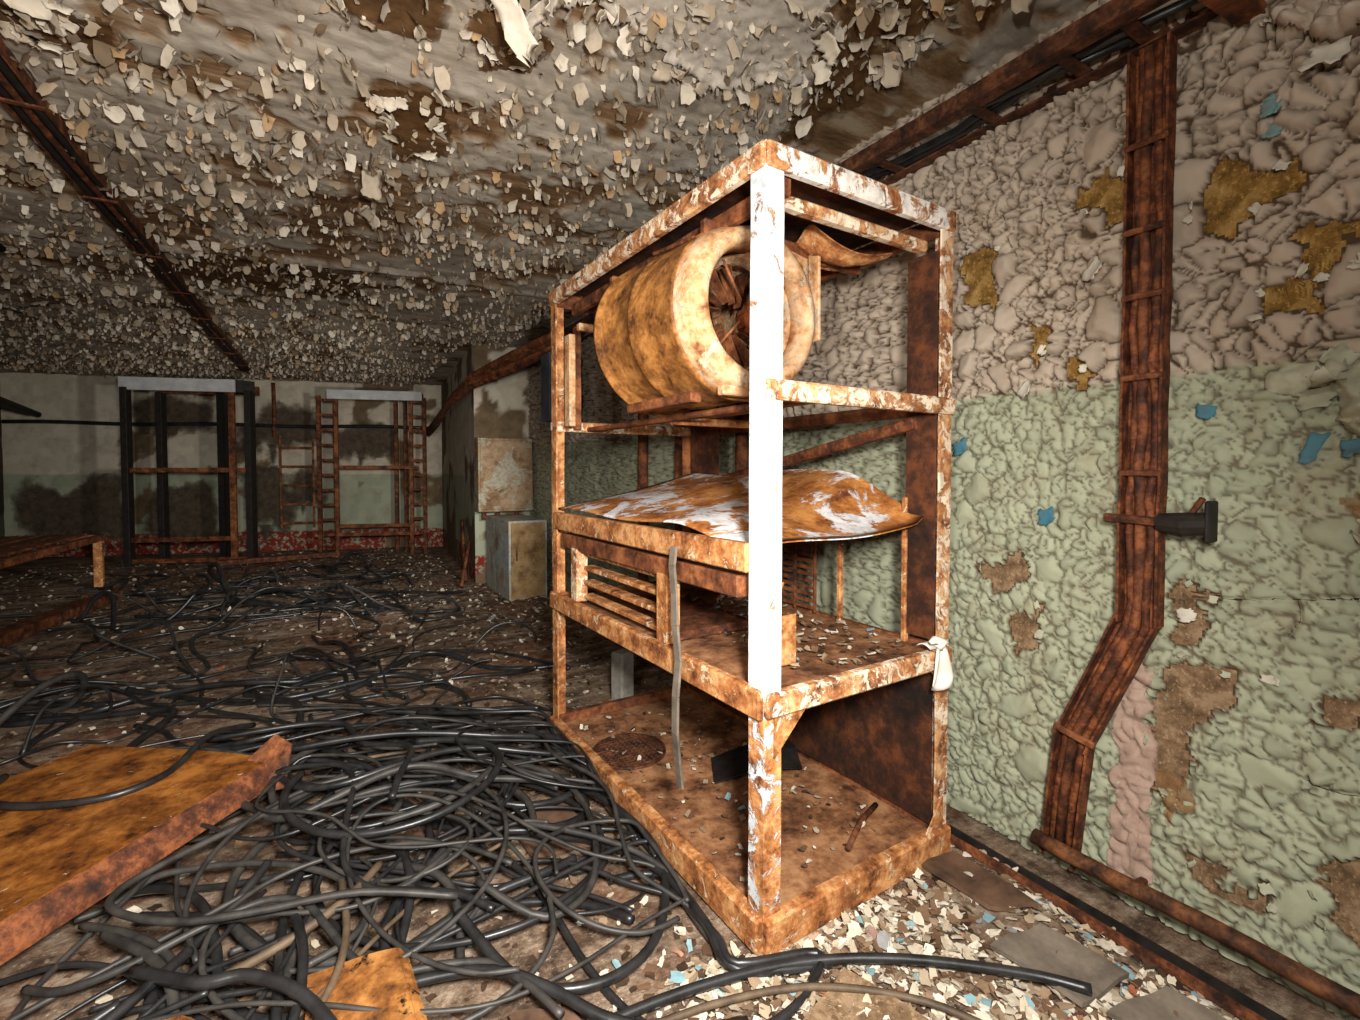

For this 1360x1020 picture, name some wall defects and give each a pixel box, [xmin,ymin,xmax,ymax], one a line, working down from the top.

peeling [0,0,1032,387]
peeling [1182,157,1306,239]
peeling [1244,219,1360,322]
damp [132,394,213,434]
damp [236,401,326,539]
damp [339,422,394,466]
damp [12,473,123,547]
damp [145,480,217,548]
peeling [976,551,1030,602]
peeling [1010,601,1044,654]
flaking render [1106,578,1237,885]
peeling [1186,853,1278,915]